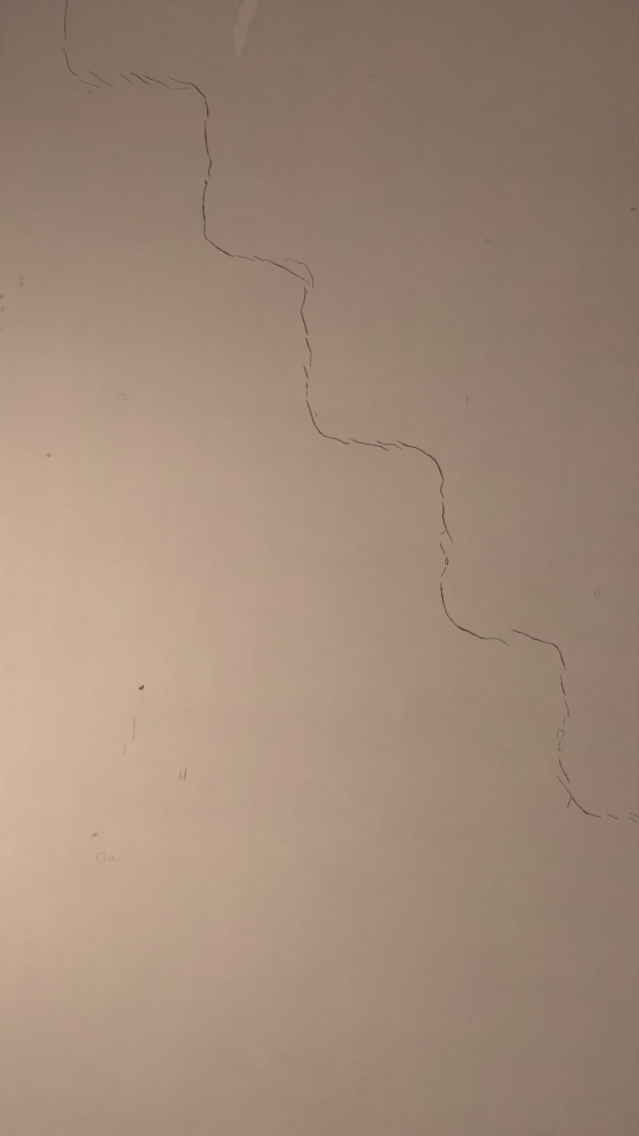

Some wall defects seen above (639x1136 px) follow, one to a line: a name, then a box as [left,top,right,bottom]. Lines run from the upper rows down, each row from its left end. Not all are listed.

crack [63,0,639,822]